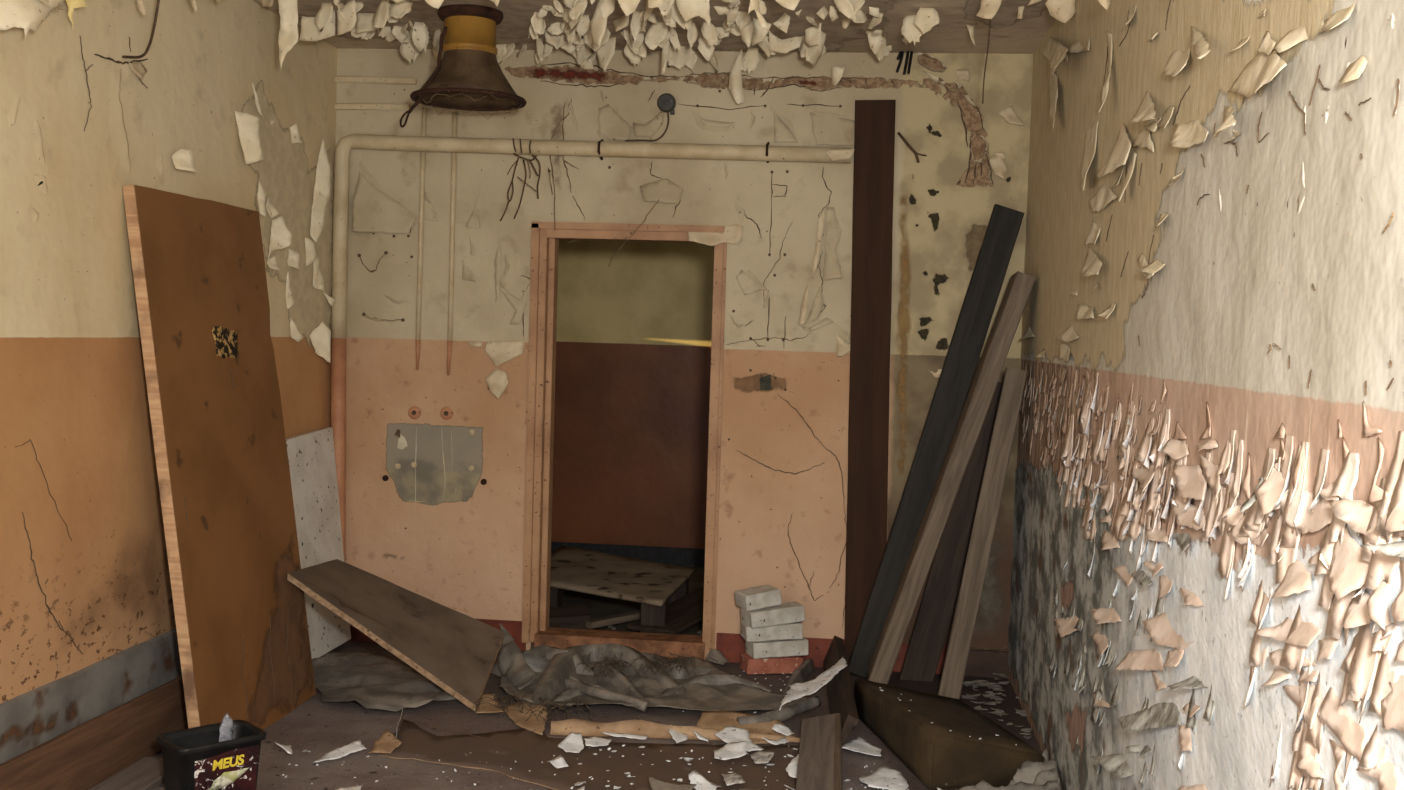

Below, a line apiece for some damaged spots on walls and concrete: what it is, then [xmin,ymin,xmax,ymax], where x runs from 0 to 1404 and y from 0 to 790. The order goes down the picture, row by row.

peeling [0,0,87,38]
peeling [172,149,197,172]
peeling [235,80,335,363]
peeling [352,160,438,239]
peeling [465,236,530,399]
peeling [259,0,1007,187]
peeling [688,177,787,254]
peeling [736,167,850,356]
peeling [961,0,1404,790]
crack [16,439,83,654]